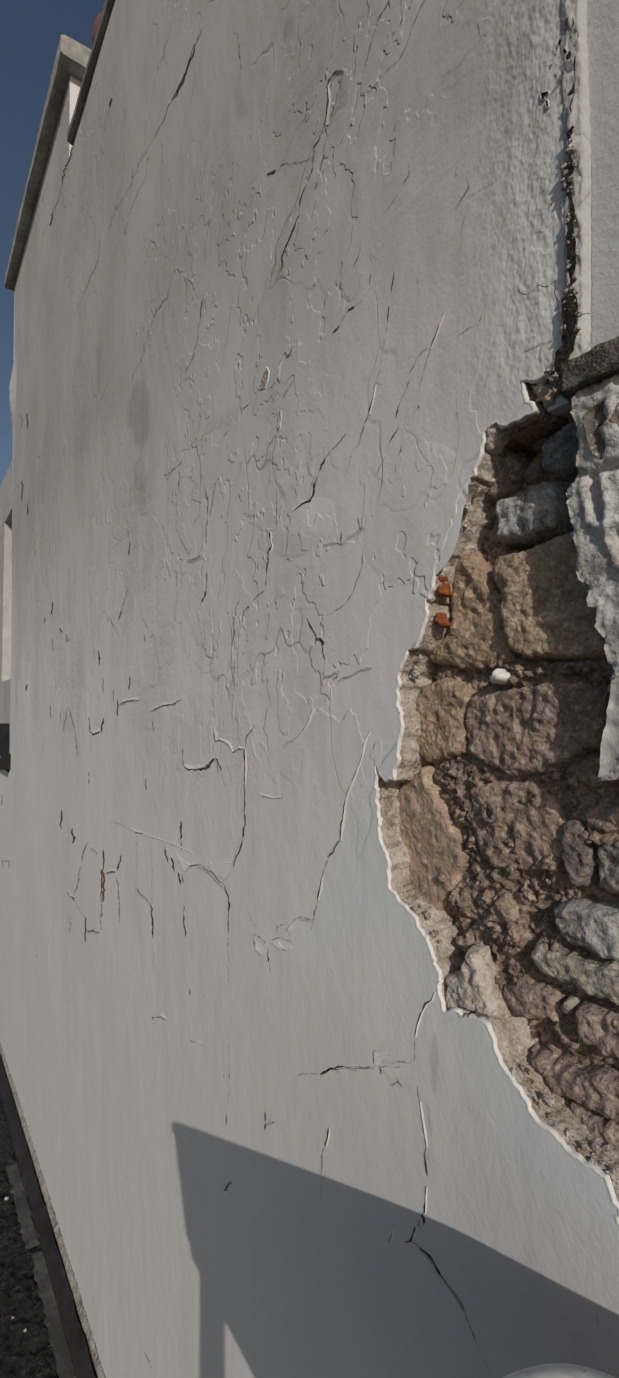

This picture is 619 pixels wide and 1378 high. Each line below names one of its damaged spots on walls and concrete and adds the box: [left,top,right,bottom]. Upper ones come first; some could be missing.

crack [156,32,201,134]
crack [267,0,424,271]
flaking render [540,91,550,109]
crack [526,16,583,382]
crack [233,314,481,639]
crack [307,555,363,660]
rust [435,576,452,629]
crack [59,810,186,938]
crack [213,727,248,933]
crack [311,732,376,929]
flaking render [373,373,619,1227]
crack [405,993,476,1341]